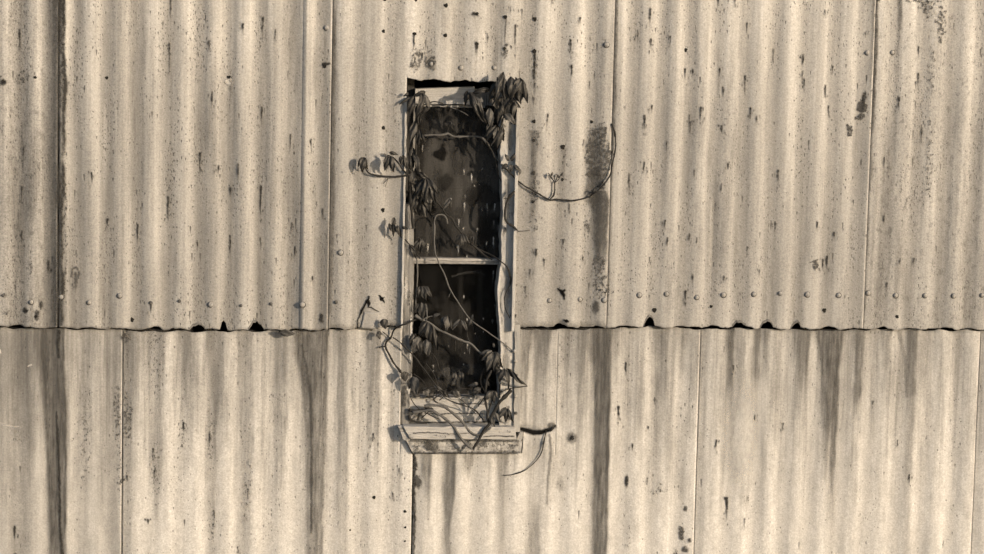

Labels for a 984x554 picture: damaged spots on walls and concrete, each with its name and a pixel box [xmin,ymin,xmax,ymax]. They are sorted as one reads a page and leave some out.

corrosion [846,0,878,137]
corrosion [900,0,947,93]
corrosion [582,71,616,313]
damp [42,327,67,554]
damp [593,328,611,554]
damp [817,329,843,463]